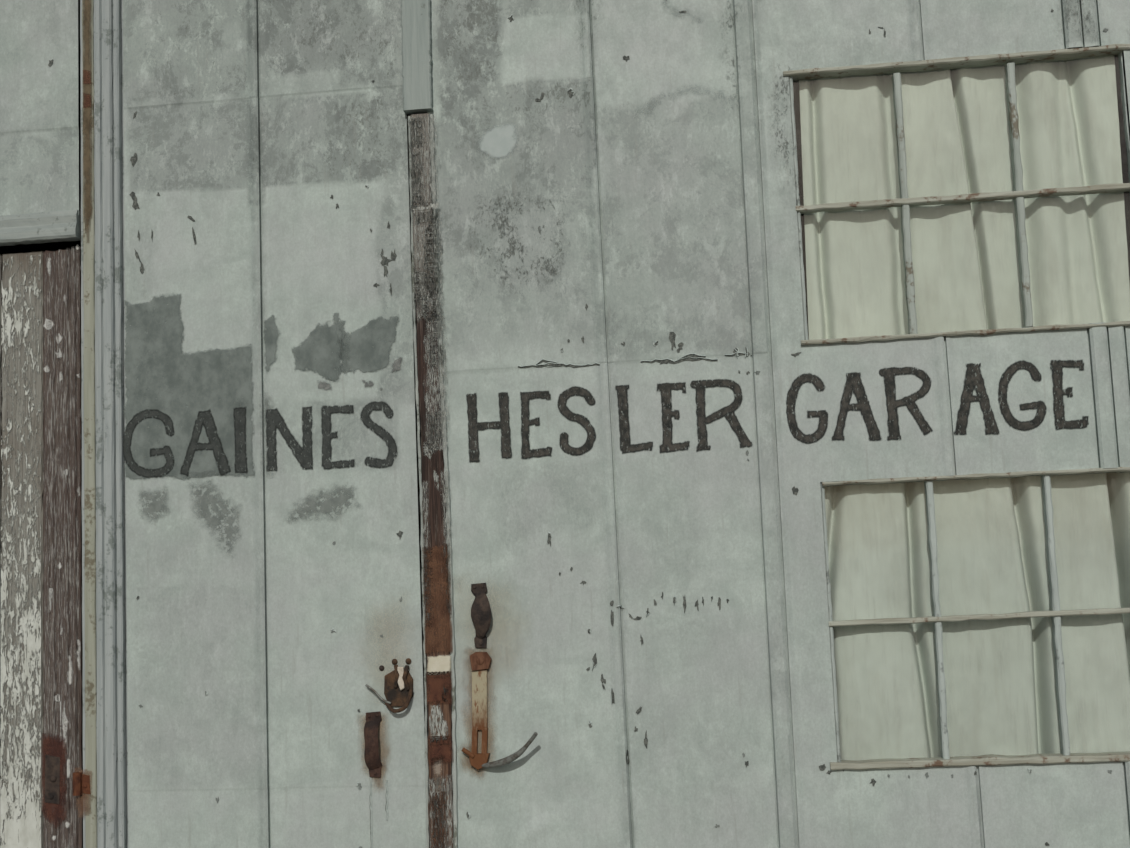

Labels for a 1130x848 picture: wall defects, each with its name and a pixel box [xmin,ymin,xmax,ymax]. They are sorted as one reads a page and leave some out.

peeling [123,294,279,480]
peeling [292,313,402,390]
peeling [0,245,82,848]
rust [41,735,90,826]